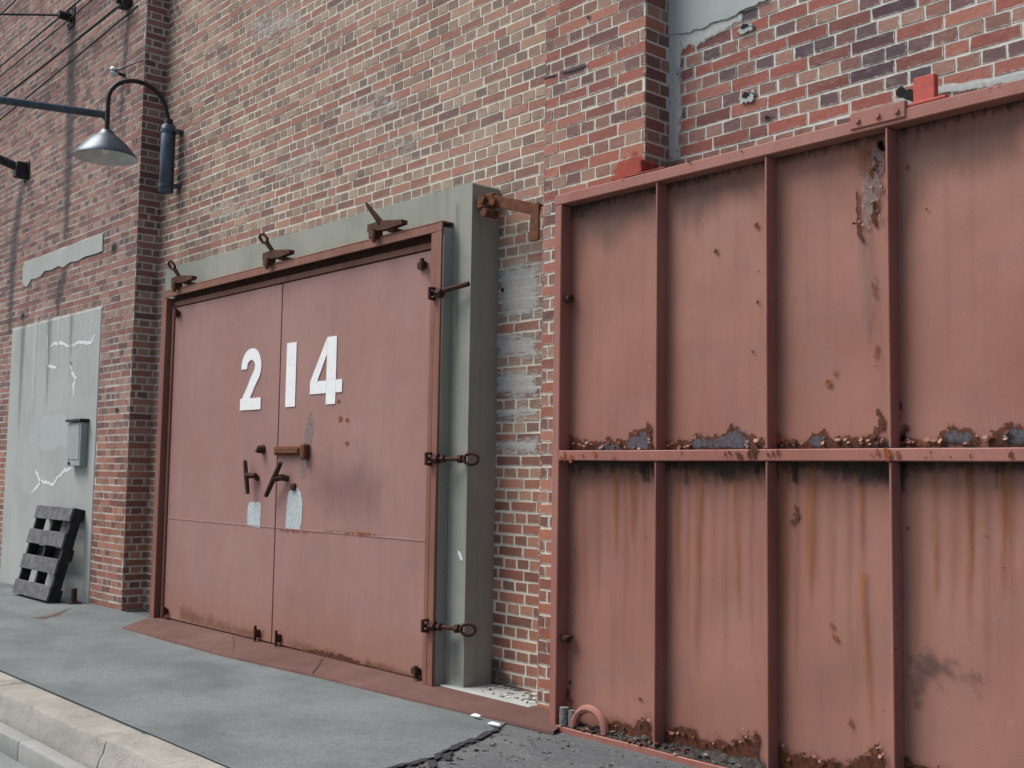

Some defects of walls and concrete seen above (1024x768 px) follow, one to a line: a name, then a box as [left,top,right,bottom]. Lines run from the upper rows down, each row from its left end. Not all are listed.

rust [870,401,910,462]